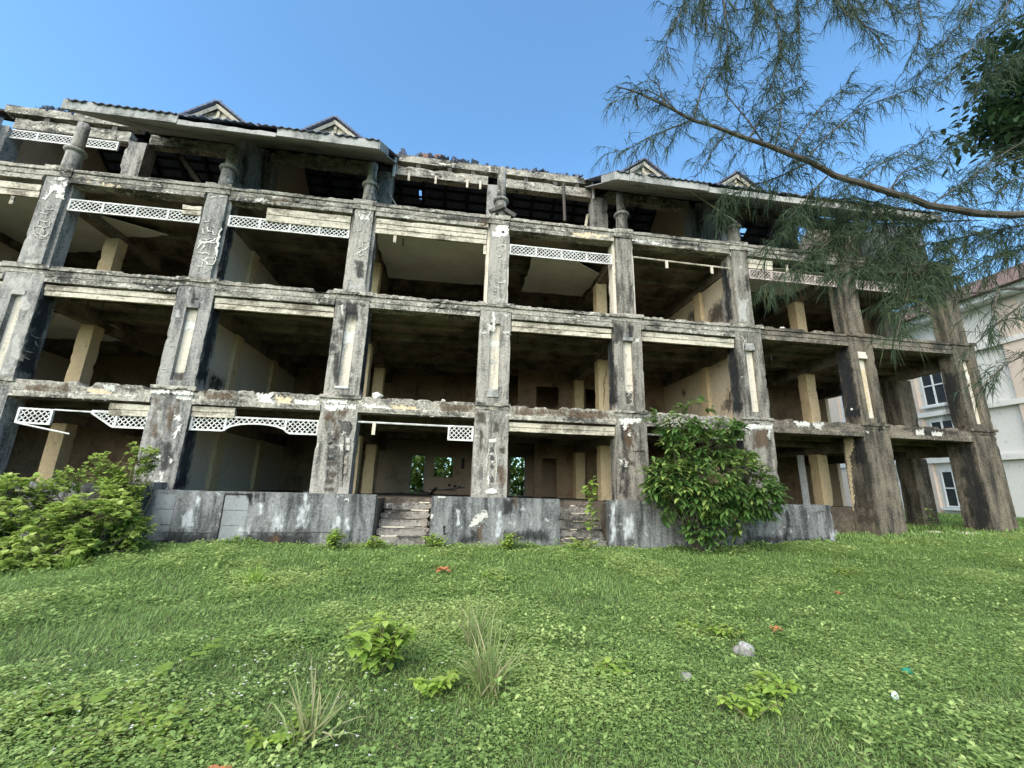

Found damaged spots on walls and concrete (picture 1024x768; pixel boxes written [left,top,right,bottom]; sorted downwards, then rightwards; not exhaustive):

peeling [32,176,67,239]
peeling [196,220,222,273]
peeling [492,224,510,262]
leakage [854,441,867,464]
leakage [916,373,988,531]
leakage [161,496,217,544]
leakage [238,493,311,545]
peeling [469,510,488,528]